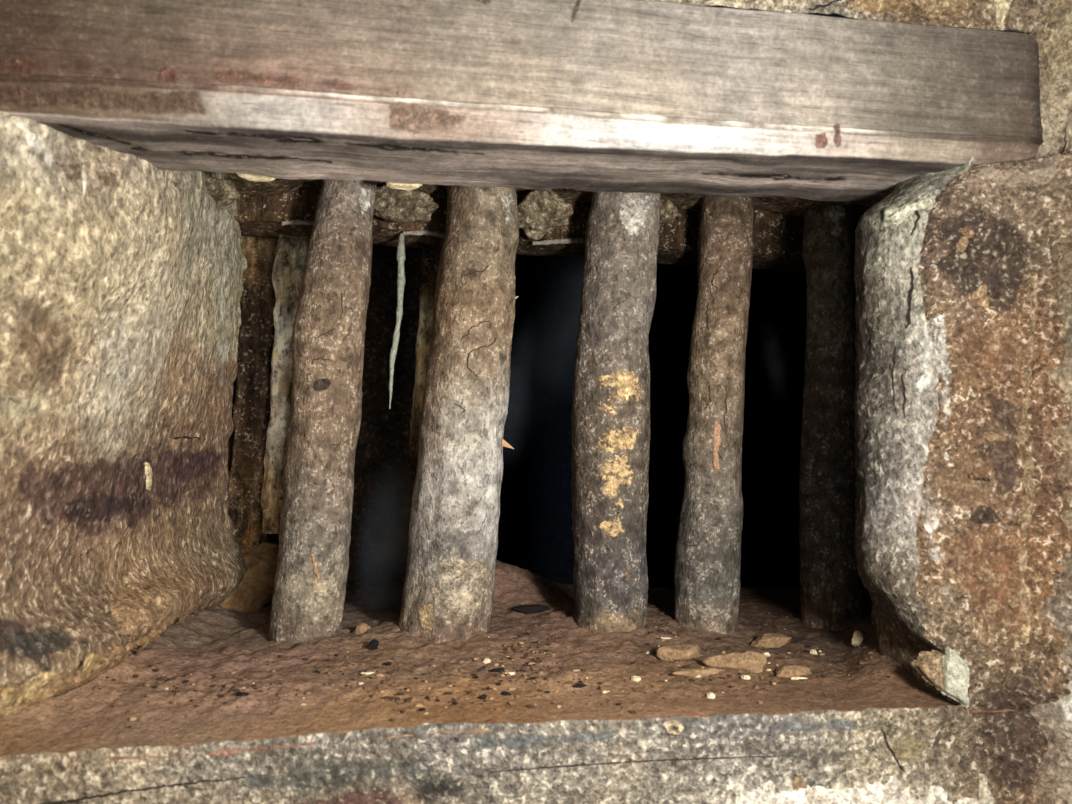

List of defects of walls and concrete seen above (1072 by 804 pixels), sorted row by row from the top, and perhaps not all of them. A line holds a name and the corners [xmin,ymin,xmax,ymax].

leakage [17,438,222,536]
leakage [0,618,87,670]
crack [41,775,265,804]
crack [492,755,788,772]